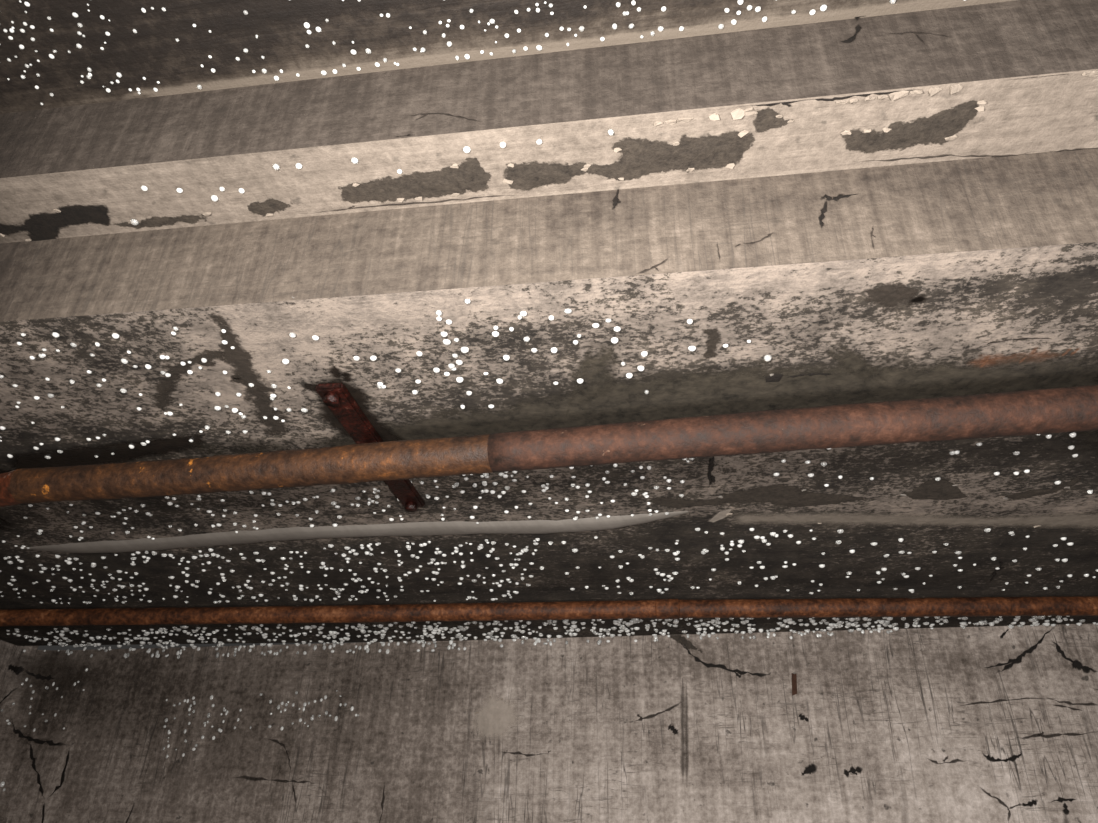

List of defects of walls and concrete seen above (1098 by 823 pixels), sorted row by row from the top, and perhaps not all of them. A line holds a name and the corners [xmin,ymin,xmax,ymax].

spalling [836,84,987,154]
spalling [503,107,794,191]
spalling [338,158,491,203]
spalling [0,205,211,241]
water stain [865,283,928,311]
water stain [703,329,721,359]
water stain [305,347,1098,448]
crack [684,646,766,678]
crack [929,629,1098,764]
crack [983,790,1075,819]